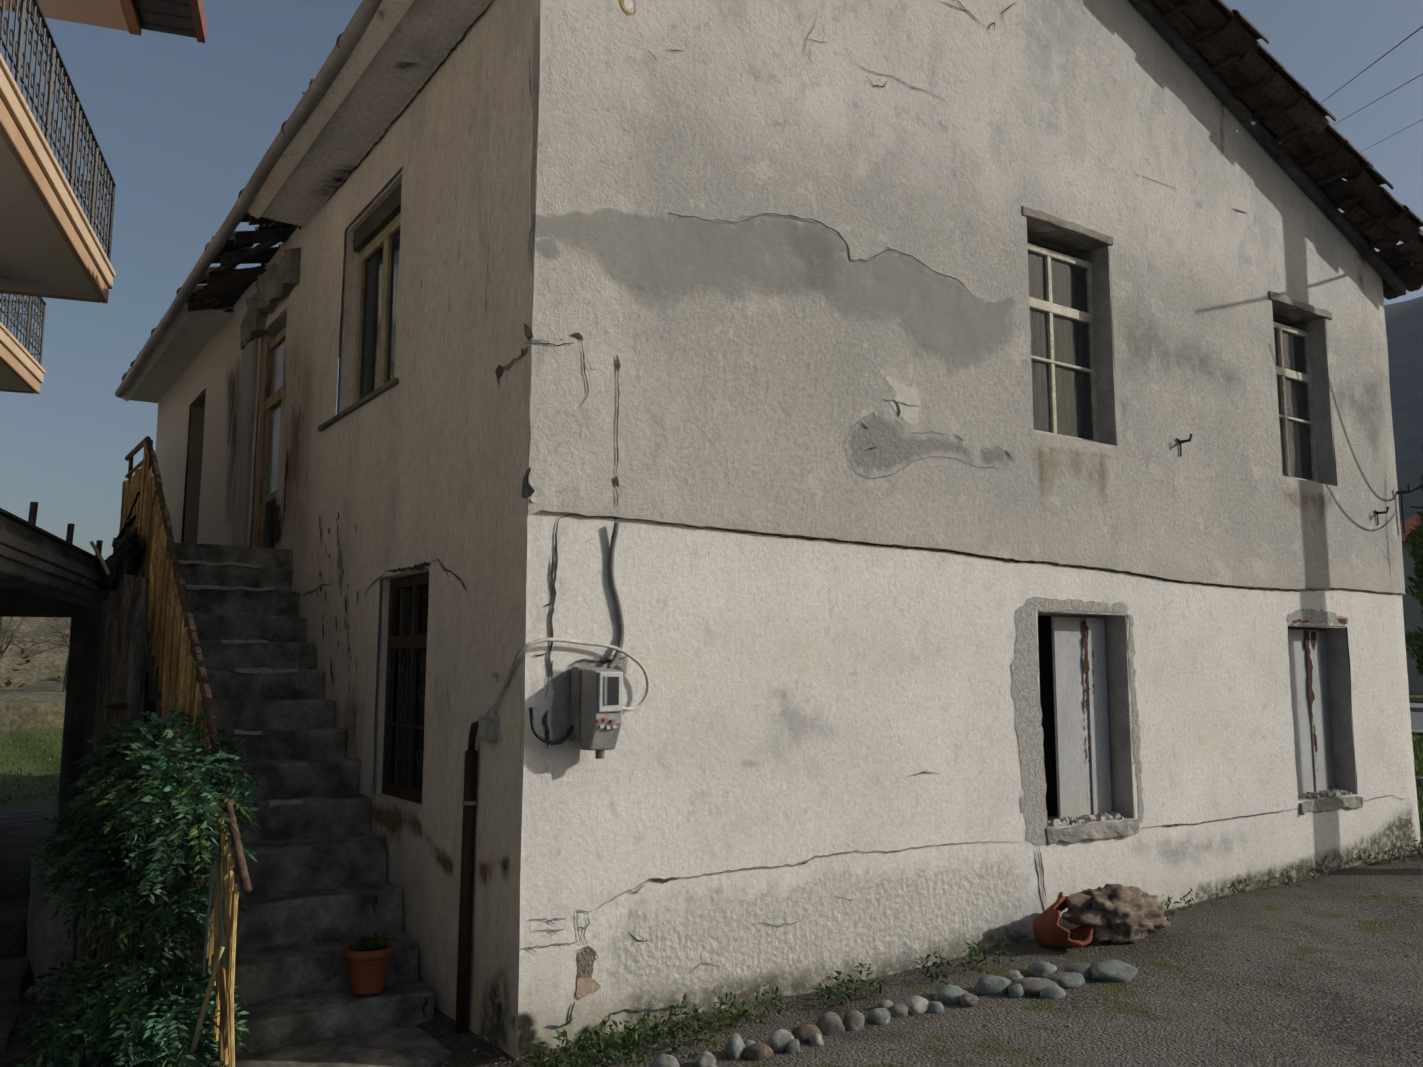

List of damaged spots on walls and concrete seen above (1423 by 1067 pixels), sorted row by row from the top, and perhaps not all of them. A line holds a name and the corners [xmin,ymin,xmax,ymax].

crack [315,0,493,214]
spalling [669,212,971,292]
crack [522,0,1392,748]
spalling [844,409,1017,479]
crack [300,559,466,647]
rust [1082,620,1094,800]
rust [1305,631,1318,771]
water stain [373,807,452,872]
spalling [575,946,600,1000]
crack [512,841,1020,952]
spalling [614,866,1021,995]